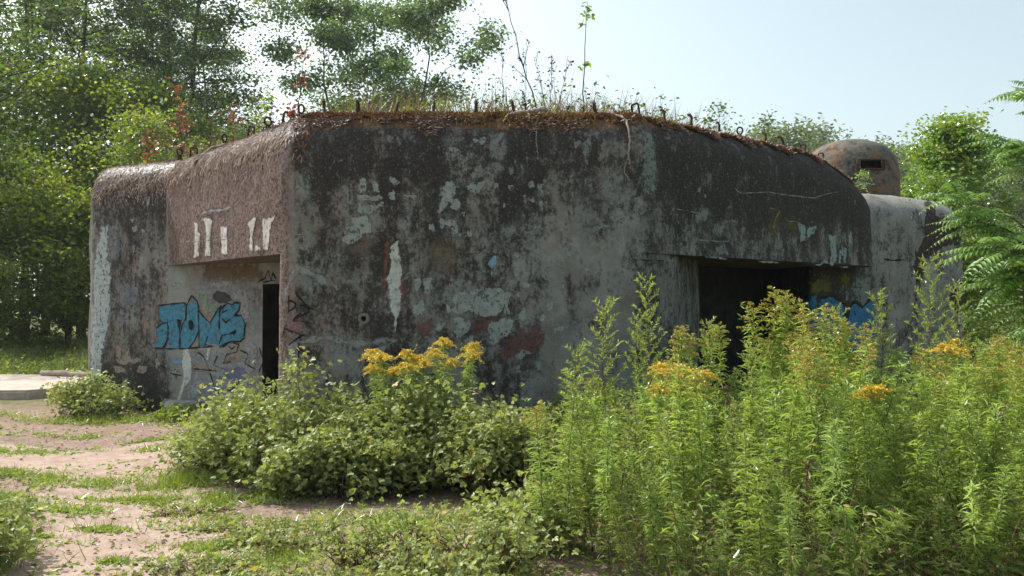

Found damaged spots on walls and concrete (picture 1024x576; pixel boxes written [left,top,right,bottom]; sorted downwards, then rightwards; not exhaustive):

peeling [341,176,417,244]
peeling [429,131,549,237]
leakage [641,130,658,196]
crack [735,188,836,228]
leakage [821,231,853,266]
leakage [91,224,120,378]
peeling [436,273,564,347]